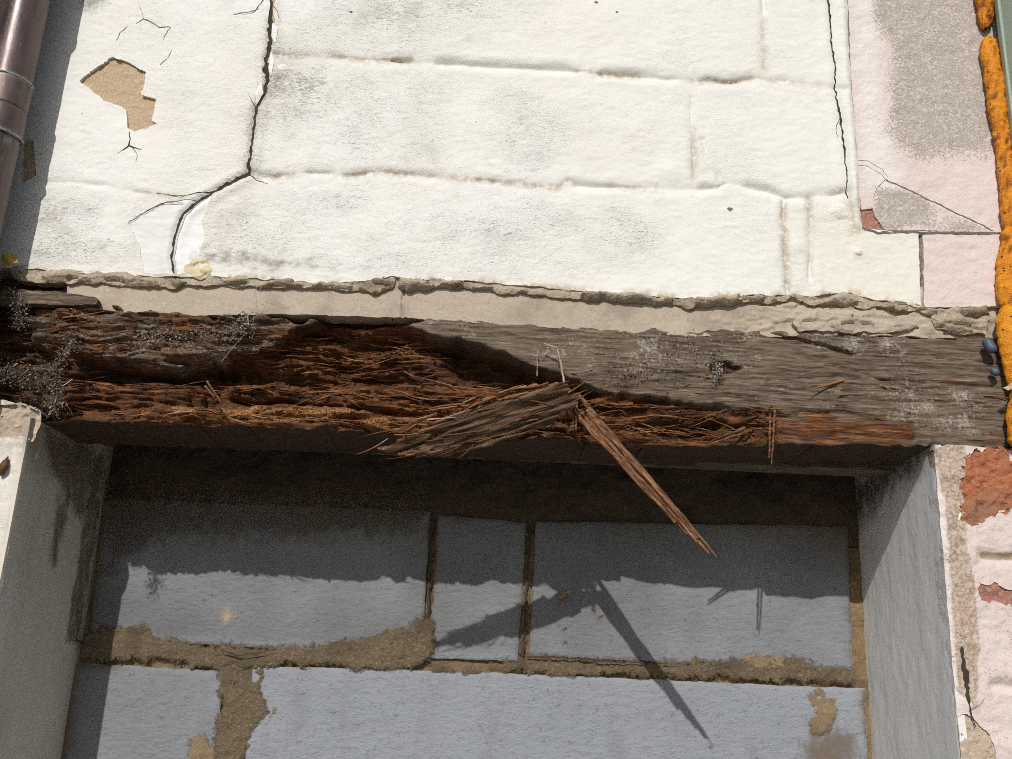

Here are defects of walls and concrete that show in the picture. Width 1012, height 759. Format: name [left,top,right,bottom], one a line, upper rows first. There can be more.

peeling [82,57,156,131]
crack [130,0,278,273]
crack [827,0,994,235]
spalling [958,446,1012,528]
spalling [978,582,1012,607]
crack [960,646,985,727]
peeling [957,714,996,759]